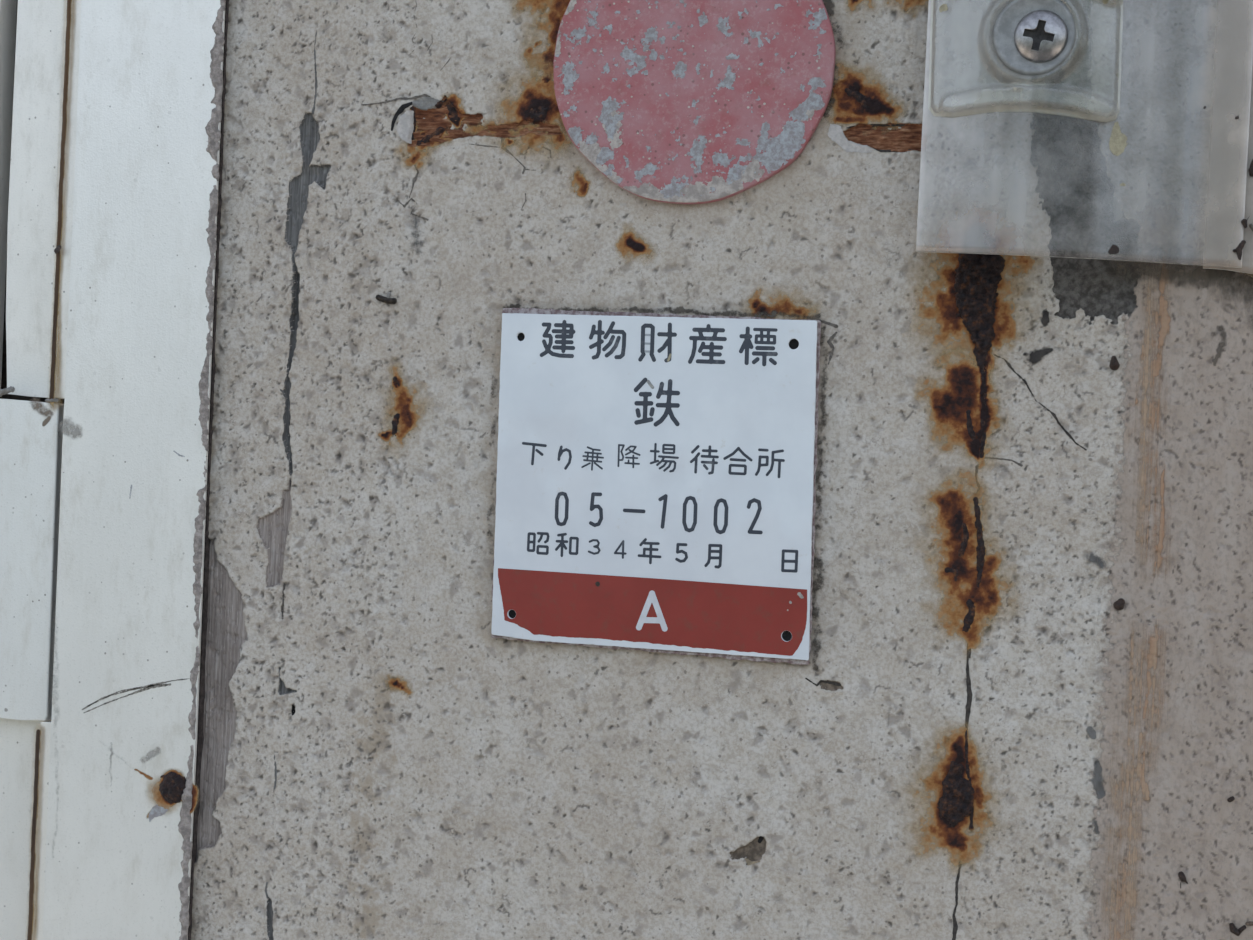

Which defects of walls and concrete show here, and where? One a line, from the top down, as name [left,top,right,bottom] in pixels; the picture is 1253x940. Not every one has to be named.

rust [497,0,571,153]
rust [828,63,903,124]
rust [616,230,652,259]
crack [257,31,331,619]
rust [378,366,421,446]
rust [916,204,1036,650]
damp [1085,203,1253,940]
crack [278,667,297,715]
crack [964,649,972,728]
rust [914,726,994,867]
crack [265,882,274,940]
crack [952,864,962,940]